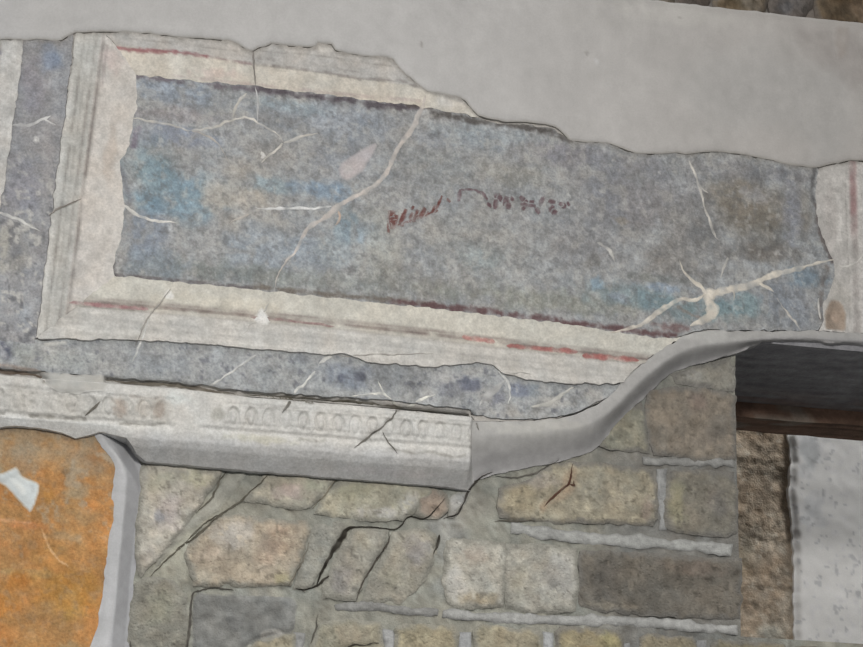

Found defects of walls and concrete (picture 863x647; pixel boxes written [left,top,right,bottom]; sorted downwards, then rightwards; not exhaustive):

crack [132,51,317,163]
crack [123,204,176,223]
crack [230,95,426,335]
crack [610,161,863,333]
crack [132,290,170,362]
crack [201,355,256,387]
crack [344,382,435,453]
flaking render [0,466,40,513]
crack [288,459,575,600]
crack [347,639,376,647]